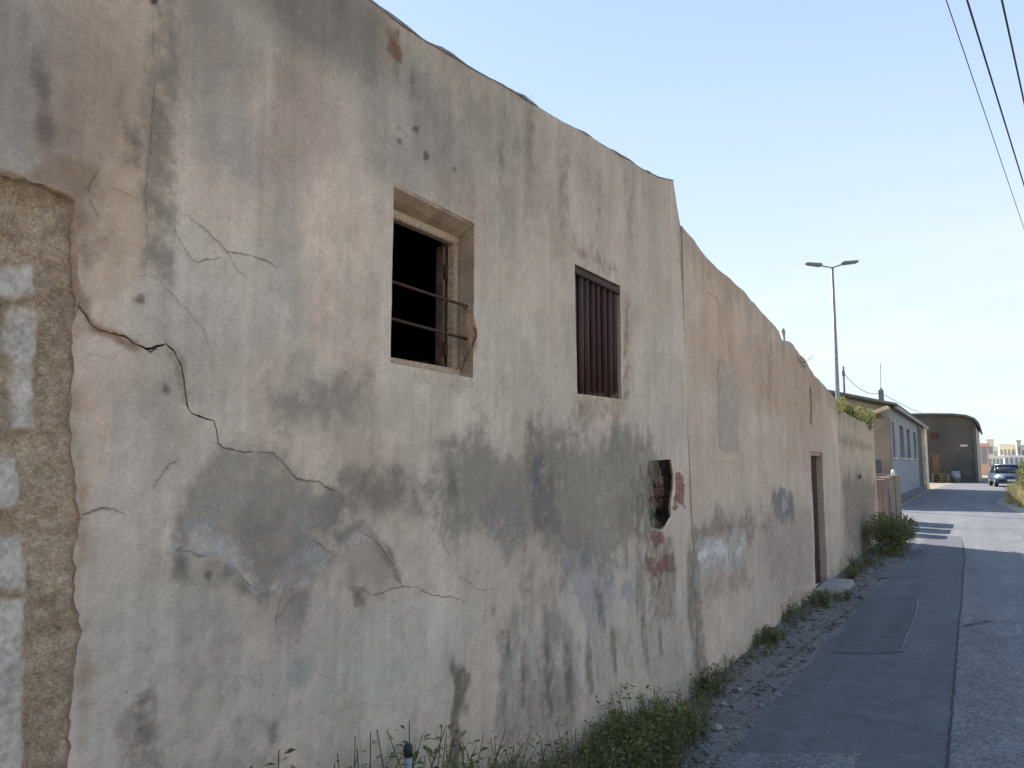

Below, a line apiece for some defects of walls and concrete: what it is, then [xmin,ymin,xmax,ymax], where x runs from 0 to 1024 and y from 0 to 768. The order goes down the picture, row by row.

crack [174,214,274,278]
spalling [0,166,85,768]
crack [75,305,344,501]
crack [350,568,486,602]
water stain [432,426,653,718]
hole [645,460,686,615]
water stain [451,662,468,768]